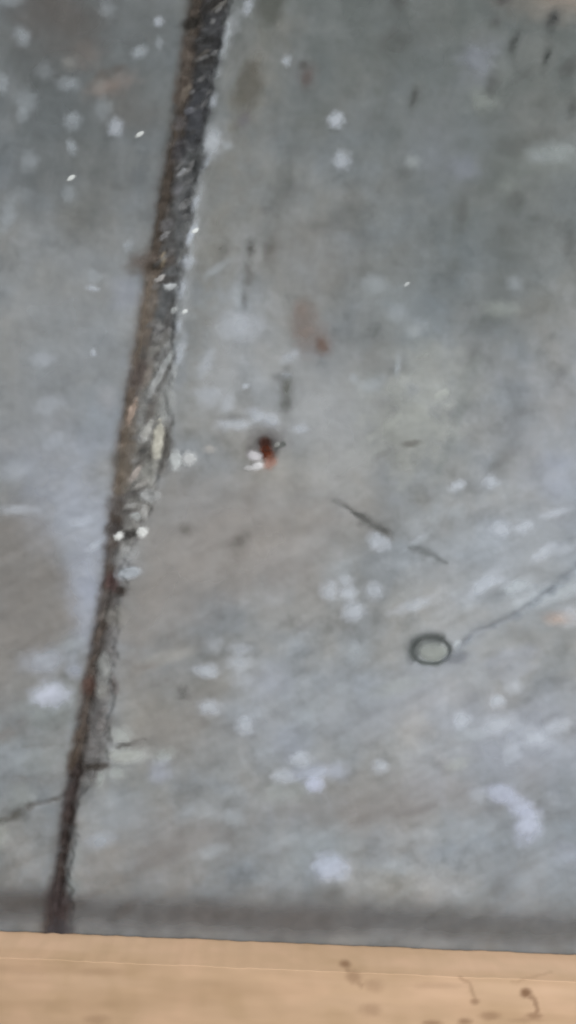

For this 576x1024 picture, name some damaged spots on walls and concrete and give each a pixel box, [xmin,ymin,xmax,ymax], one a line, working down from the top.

crack [27,0,227,934]
corrosion [250,432,285,469]